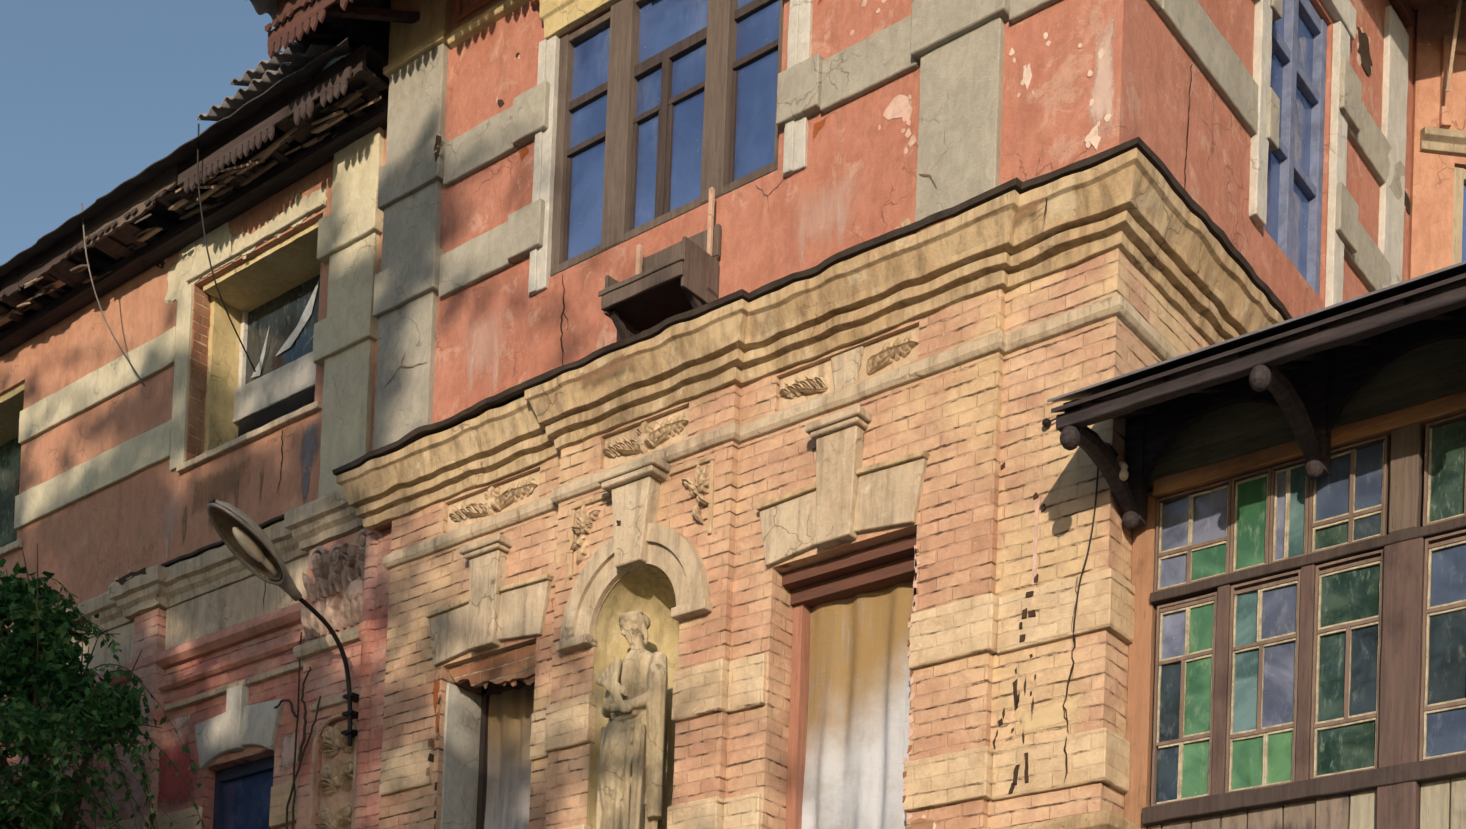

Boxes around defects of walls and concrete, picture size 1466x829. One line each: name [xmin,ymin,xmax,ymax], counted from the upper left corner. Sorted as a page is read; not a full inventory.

peeling [878,95,916,154]
peeling [1078,24,1114,150]
crack [560,274,568,364]
spalling [993,574,1039,794]
crack [1062,576,1078,782]